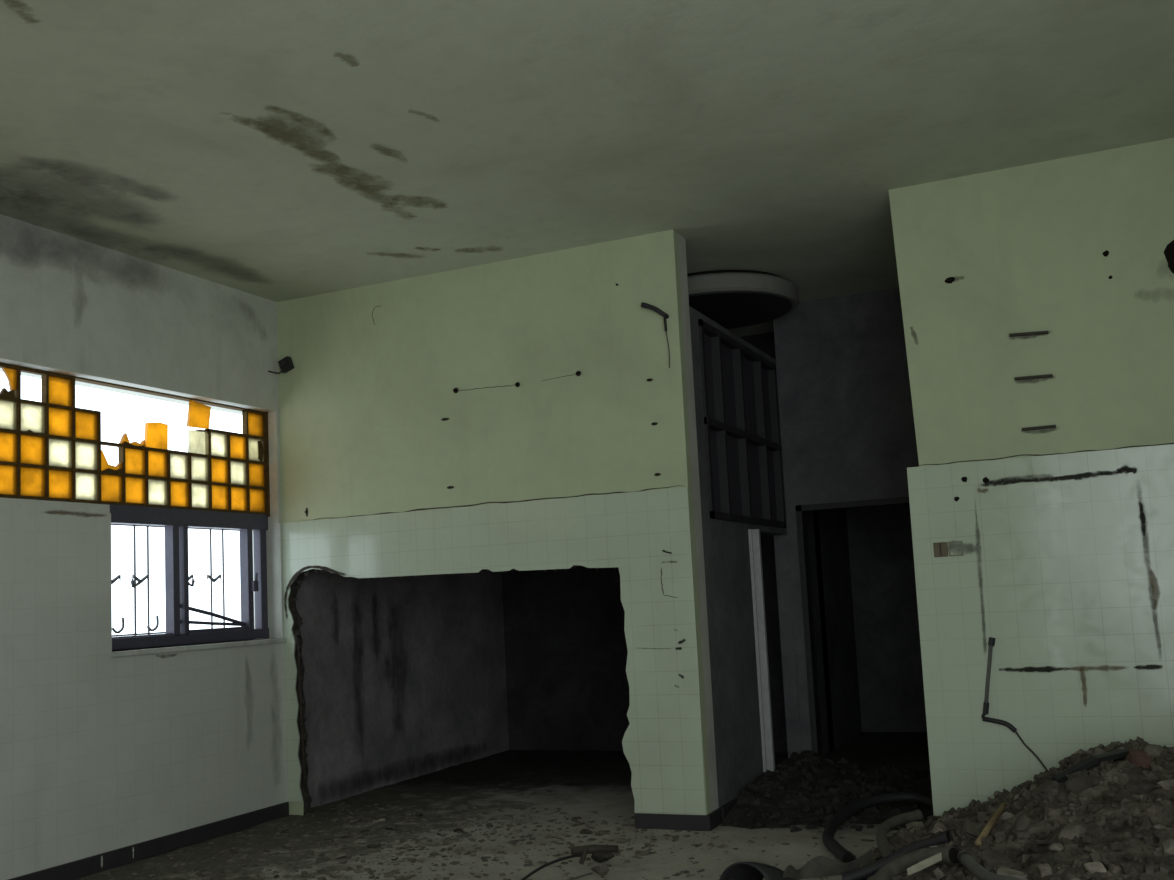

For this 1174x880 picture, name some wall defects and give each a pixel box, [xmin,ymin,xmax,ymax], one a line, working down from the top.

spalling [284,566,384,812]